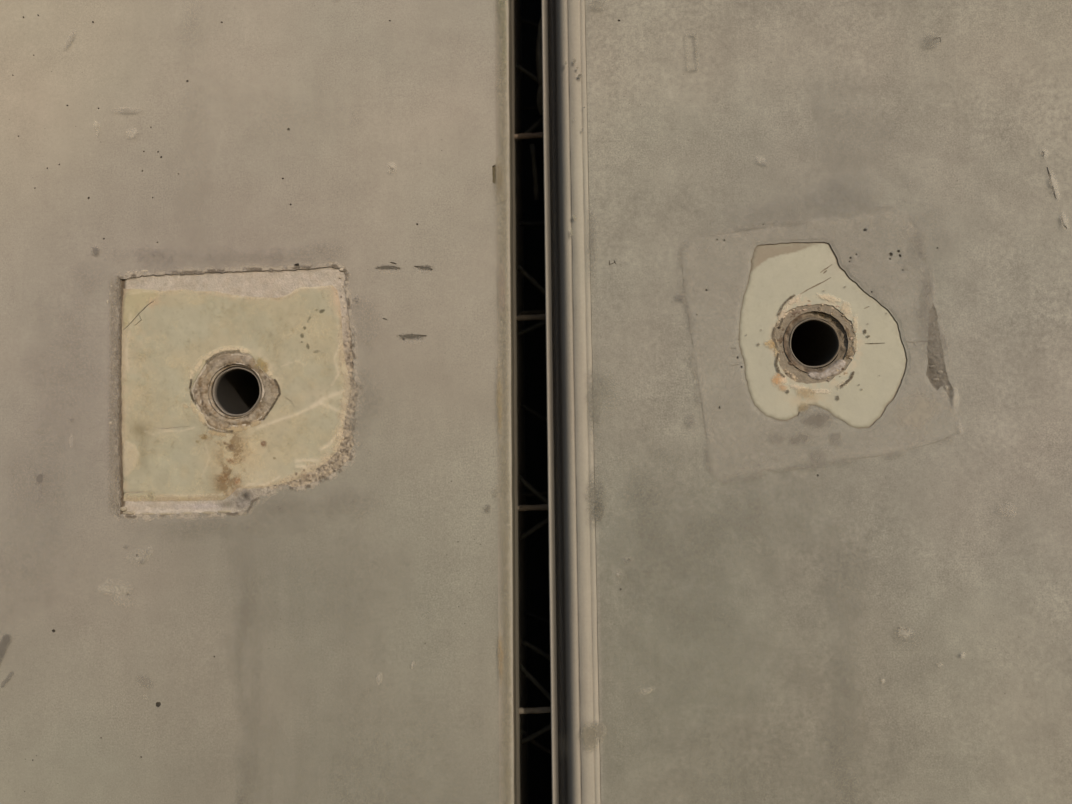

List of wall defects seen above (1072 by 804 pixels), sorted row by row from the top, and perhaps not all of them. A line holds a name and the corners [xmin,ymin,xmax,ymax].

spalling [106,262,364,521]
peeling [926,303,954,404]
corrosion [196,434,244,492]